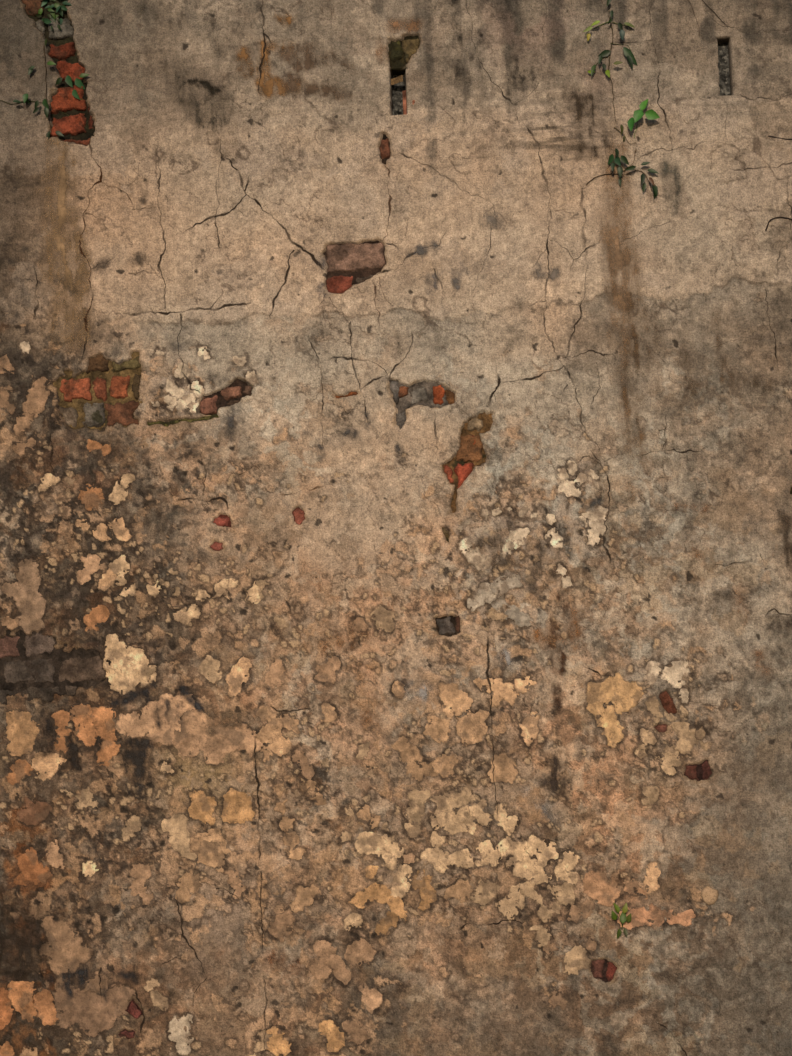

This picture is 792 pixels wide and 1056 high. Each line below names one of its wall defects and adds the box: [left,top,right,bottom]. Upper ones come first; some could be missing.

leakage [175,72,230,128]
leakage [280,45,352,100]
leakage [571,92,608,156]
crack [79,142,322,392]
flaking render [323,241,386,294]
crack [374,154,444,316]
leakage [662,163,680,212]
flaking render [0,352,259,456]
crack [311,297,413,445]
flaking render [389,380,455,429]
crack [489,129,611,559]
peeling [435,506,564,637]